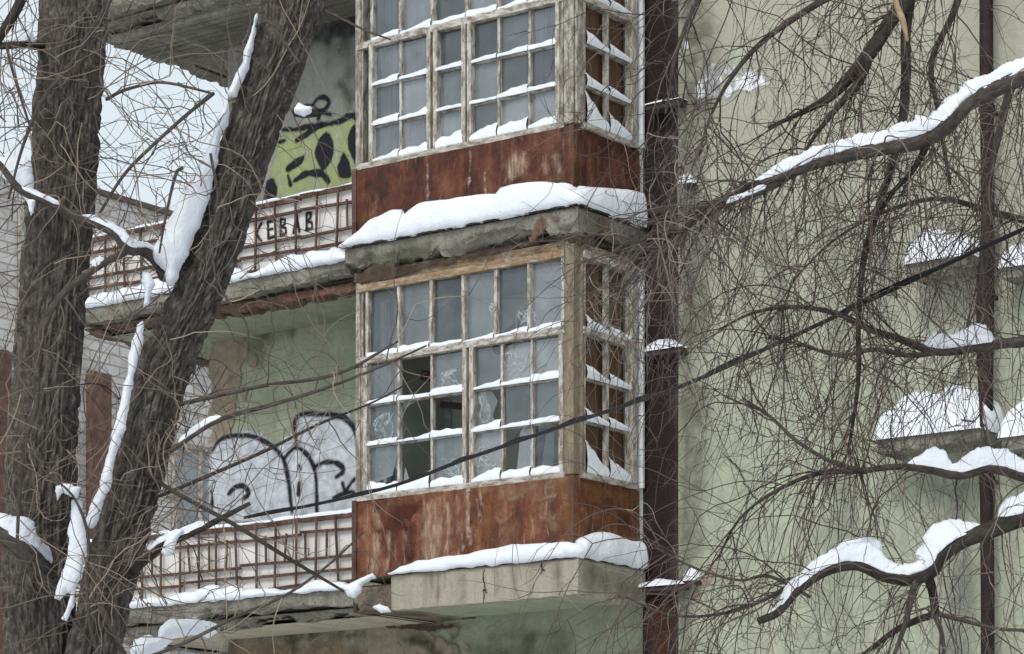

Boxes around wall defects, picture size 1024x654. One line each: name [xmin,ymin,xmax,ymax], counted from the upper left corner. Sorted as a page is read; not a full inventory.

corrosion [386,502,420,534]